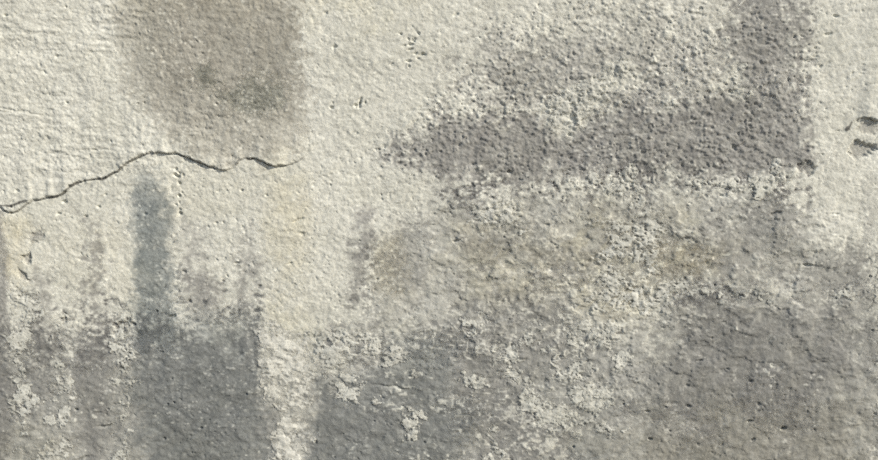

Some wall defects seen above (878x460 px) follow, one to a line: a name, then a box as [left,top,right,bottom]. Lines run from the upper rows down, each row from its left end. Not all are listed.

crack [48,172,116,198]